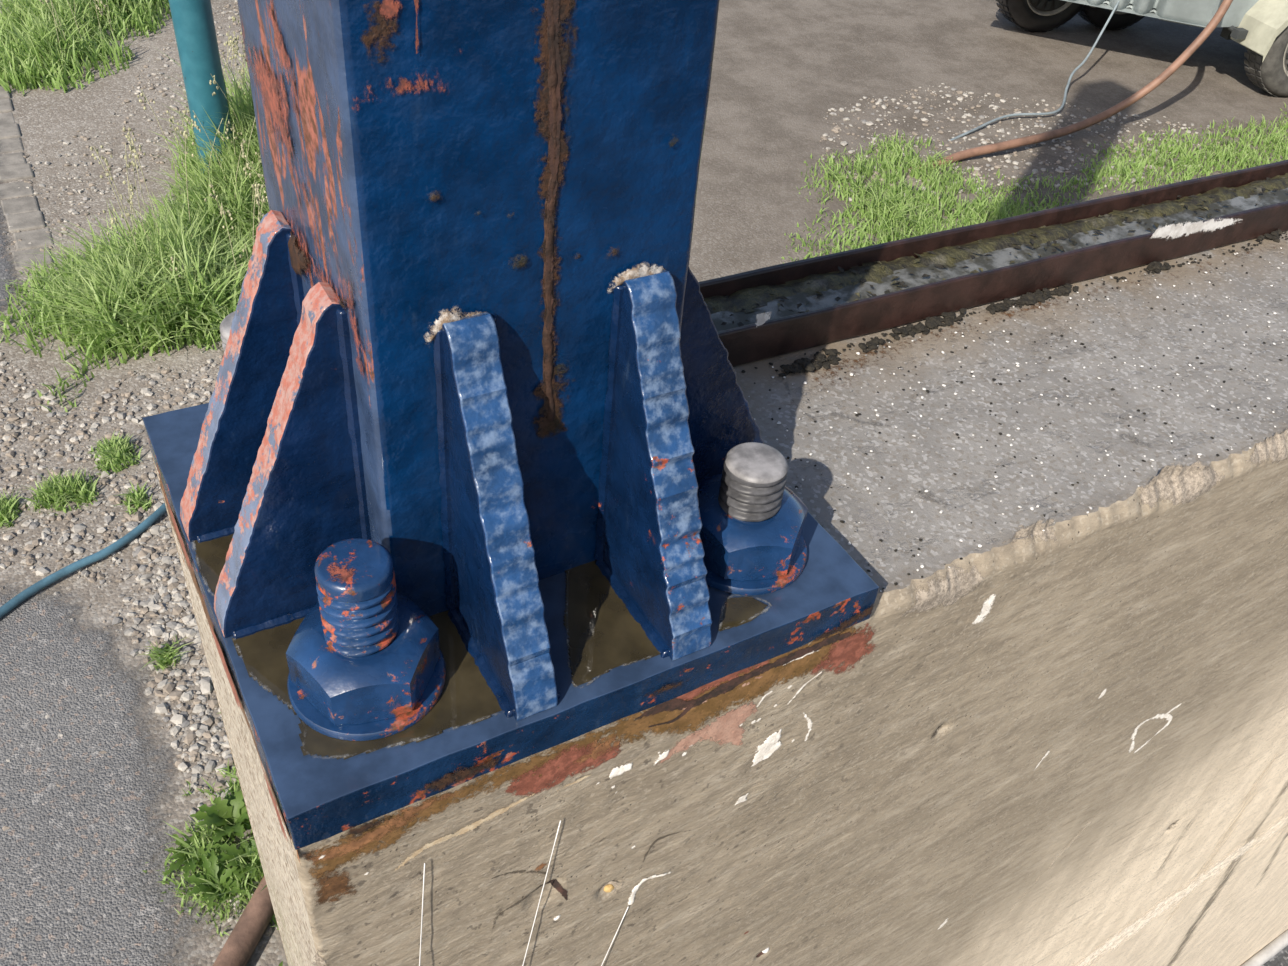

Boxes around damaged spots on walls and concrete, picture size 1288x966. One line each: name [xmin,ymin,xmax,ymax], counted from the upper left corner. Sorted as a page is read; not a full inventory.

corrosion [361,0,401,63]
corrosion [533,0,578,439]
spalling [1246,429,1288,464]
spalling [1139,461,1225,509]
spalling [1003,515,1057,544]
corrosion [158,473,875,880]